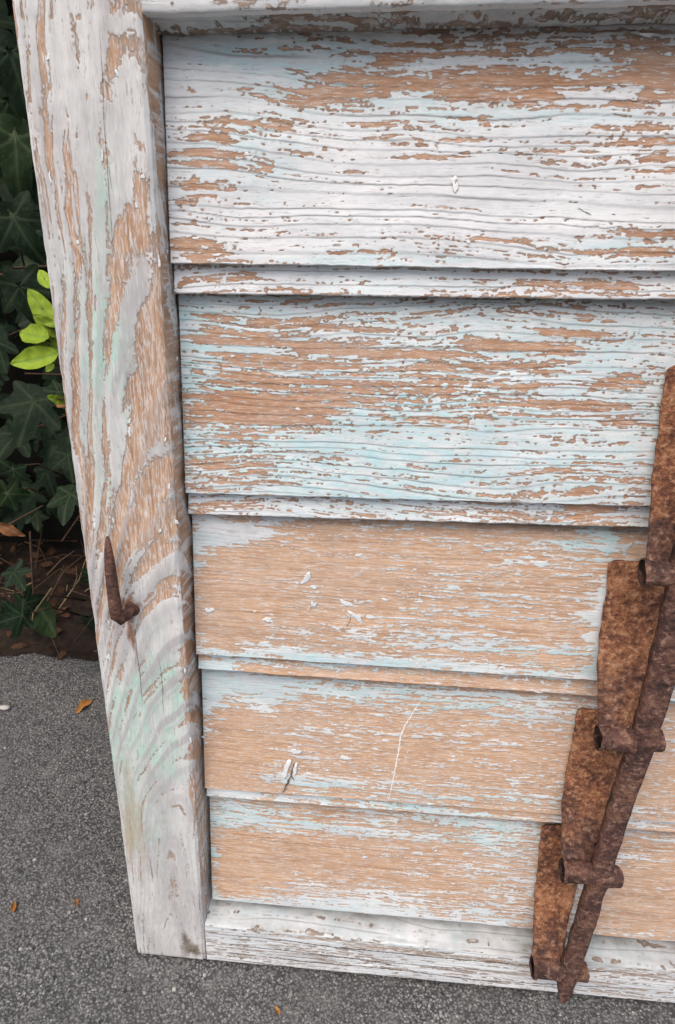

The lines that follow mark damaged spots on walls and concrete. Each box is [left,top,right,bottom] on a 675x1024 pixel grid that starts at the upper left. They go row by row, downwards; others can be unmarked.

peeling [13,0,32,114]
peeling [62,0,94,69]
peeling [278,143,327,159]
peeling [342,106,510,161]
peeling [515,121,675,179]
peeling [554,175,620,191]
peeling [316,232,446,280]
peeling [407,448,470,474]
peeling [90,567,128,695]
peeling [593,689,675,948]
peeling [126,782,185,955]
peeling [573,956,675,1002]